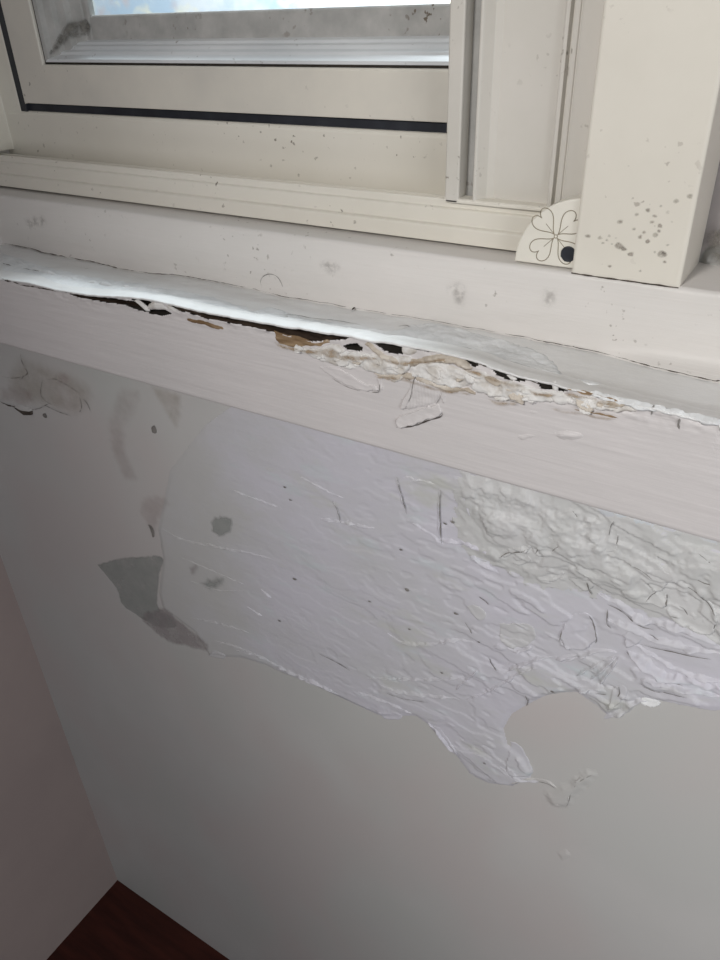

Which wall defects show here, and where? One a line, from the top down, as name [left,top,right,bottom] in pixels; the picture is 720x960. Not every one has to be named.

peeling [14,404,47,418]
peeling [278,342,720,428]
crack [396,477,406,512]
crack [435,489,443,543]
crack [636,554,716,629]
crack [589,606,705,659]